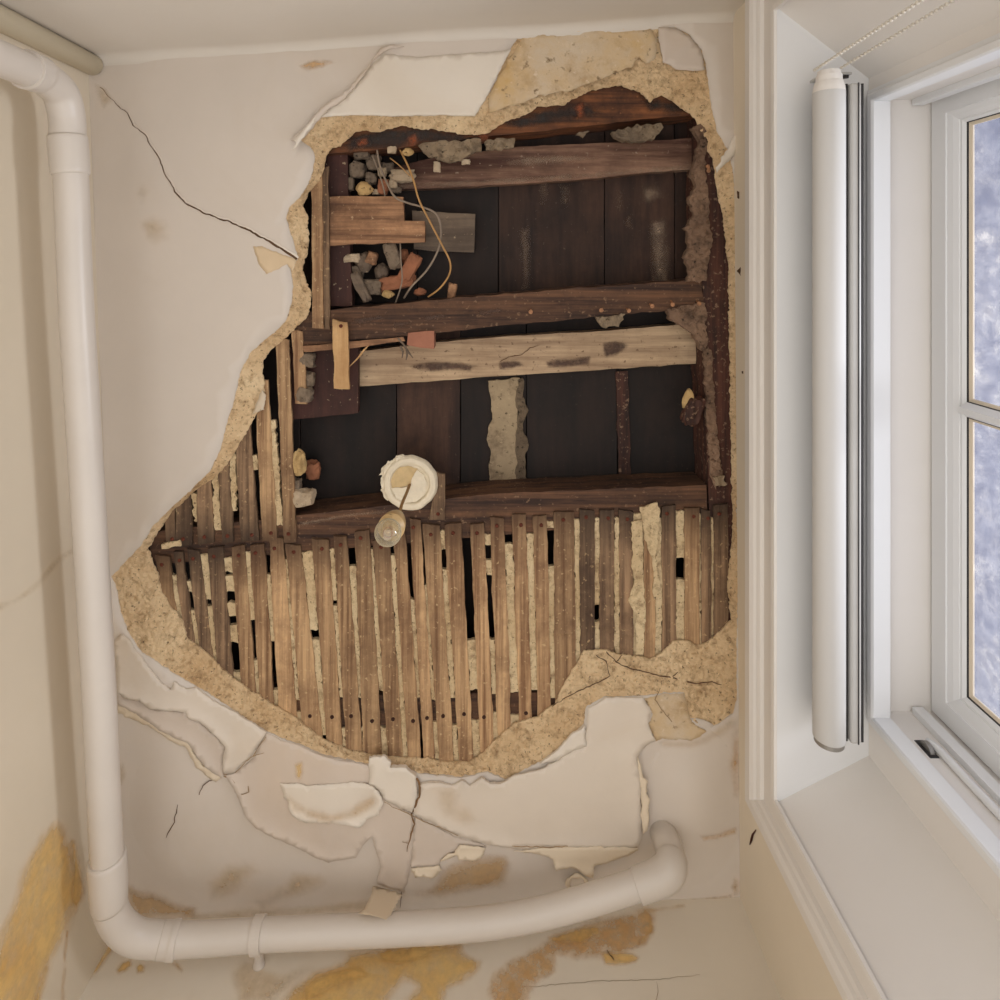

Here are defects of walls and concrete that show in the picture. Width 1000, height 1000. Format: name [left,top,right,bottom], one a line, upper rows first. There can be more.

crack [100,86,299,260]
spalling [112,27,743,920]
crack [552,651,721,722]
crack [199,737,266,795]
crack [385,778,458,849]
crack [513,843,568,851]
water stain [0,829,81,1000]
water stain [290,947,475,1000]
water stain [493,911,652,1000]